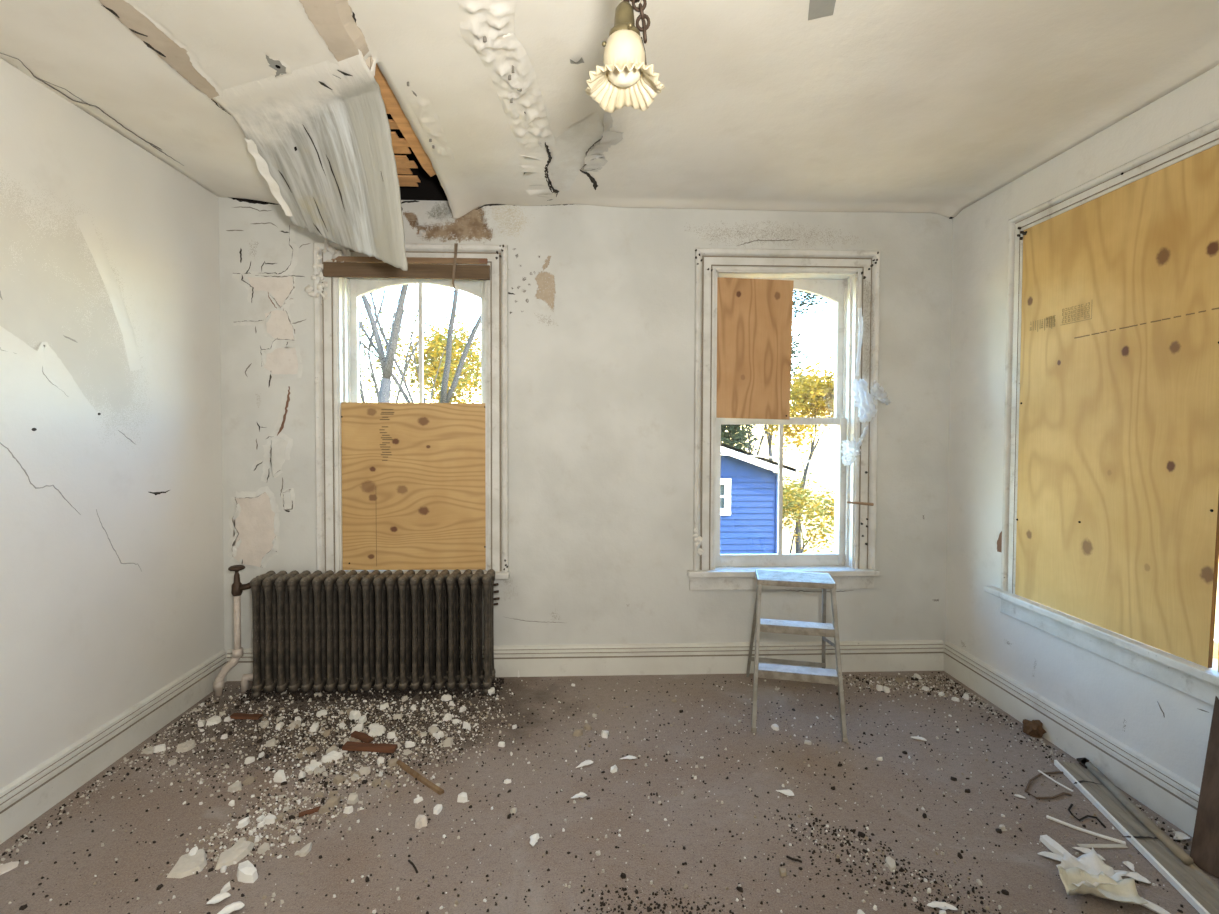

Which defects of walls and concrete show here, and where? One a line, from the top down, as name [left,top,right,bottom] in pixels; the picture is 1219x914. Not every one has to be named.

peeling [95,0,230,115]
peeling [244,138,292,216]
peeling [550,112,624,191]
peeling [0,326,98,432]
crack [0,442,141,569]
peeling [227,486,295,573]